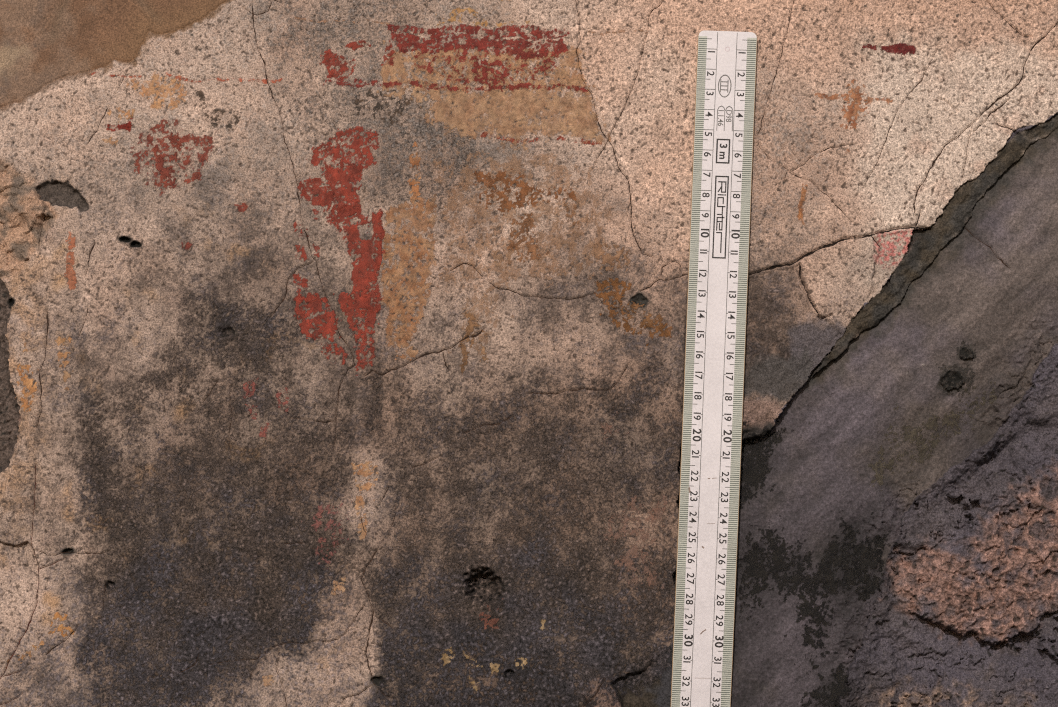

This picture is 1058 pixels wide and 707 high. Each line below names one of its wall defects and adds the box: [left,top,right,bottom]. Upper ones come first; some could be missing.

spalling [0,278,22,473]
crack [245,0,483,444]
crack [450,263,596,300]
crack [529,365,628,395]
crack [575,0,688,291]
peeling [840,79,870,129]
peeling [881,43,916,56]
crack [748,1,1058,320]
crack [179,487,396,707]
damp [73,293,684,707]